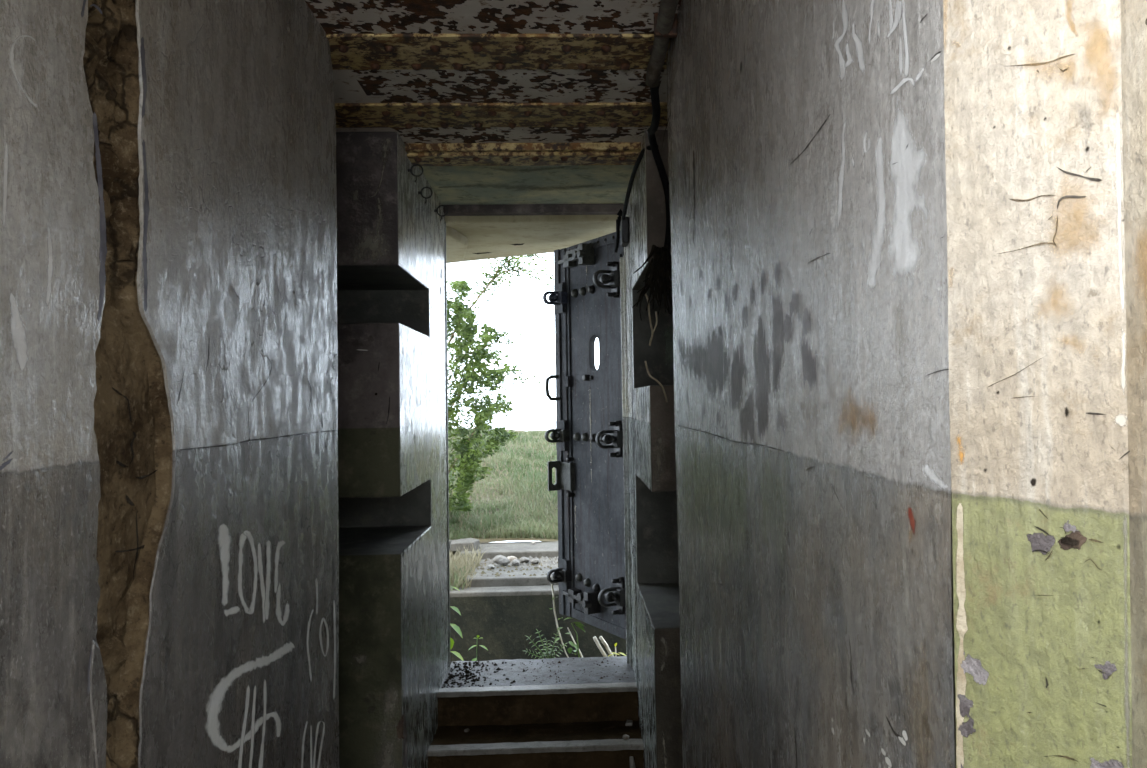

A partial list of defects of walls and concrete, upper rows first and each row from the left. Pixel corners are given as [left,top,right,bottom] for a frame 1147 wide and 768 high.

peeling [304,0,661,34]
peeling [352,69,665,103]
peeling [392,127,647,143]
crack [81,0,335,768]
spalling [1027,509,1103,570]
peeling [956,503,989,768]
peeling [1090,641,1129,768]